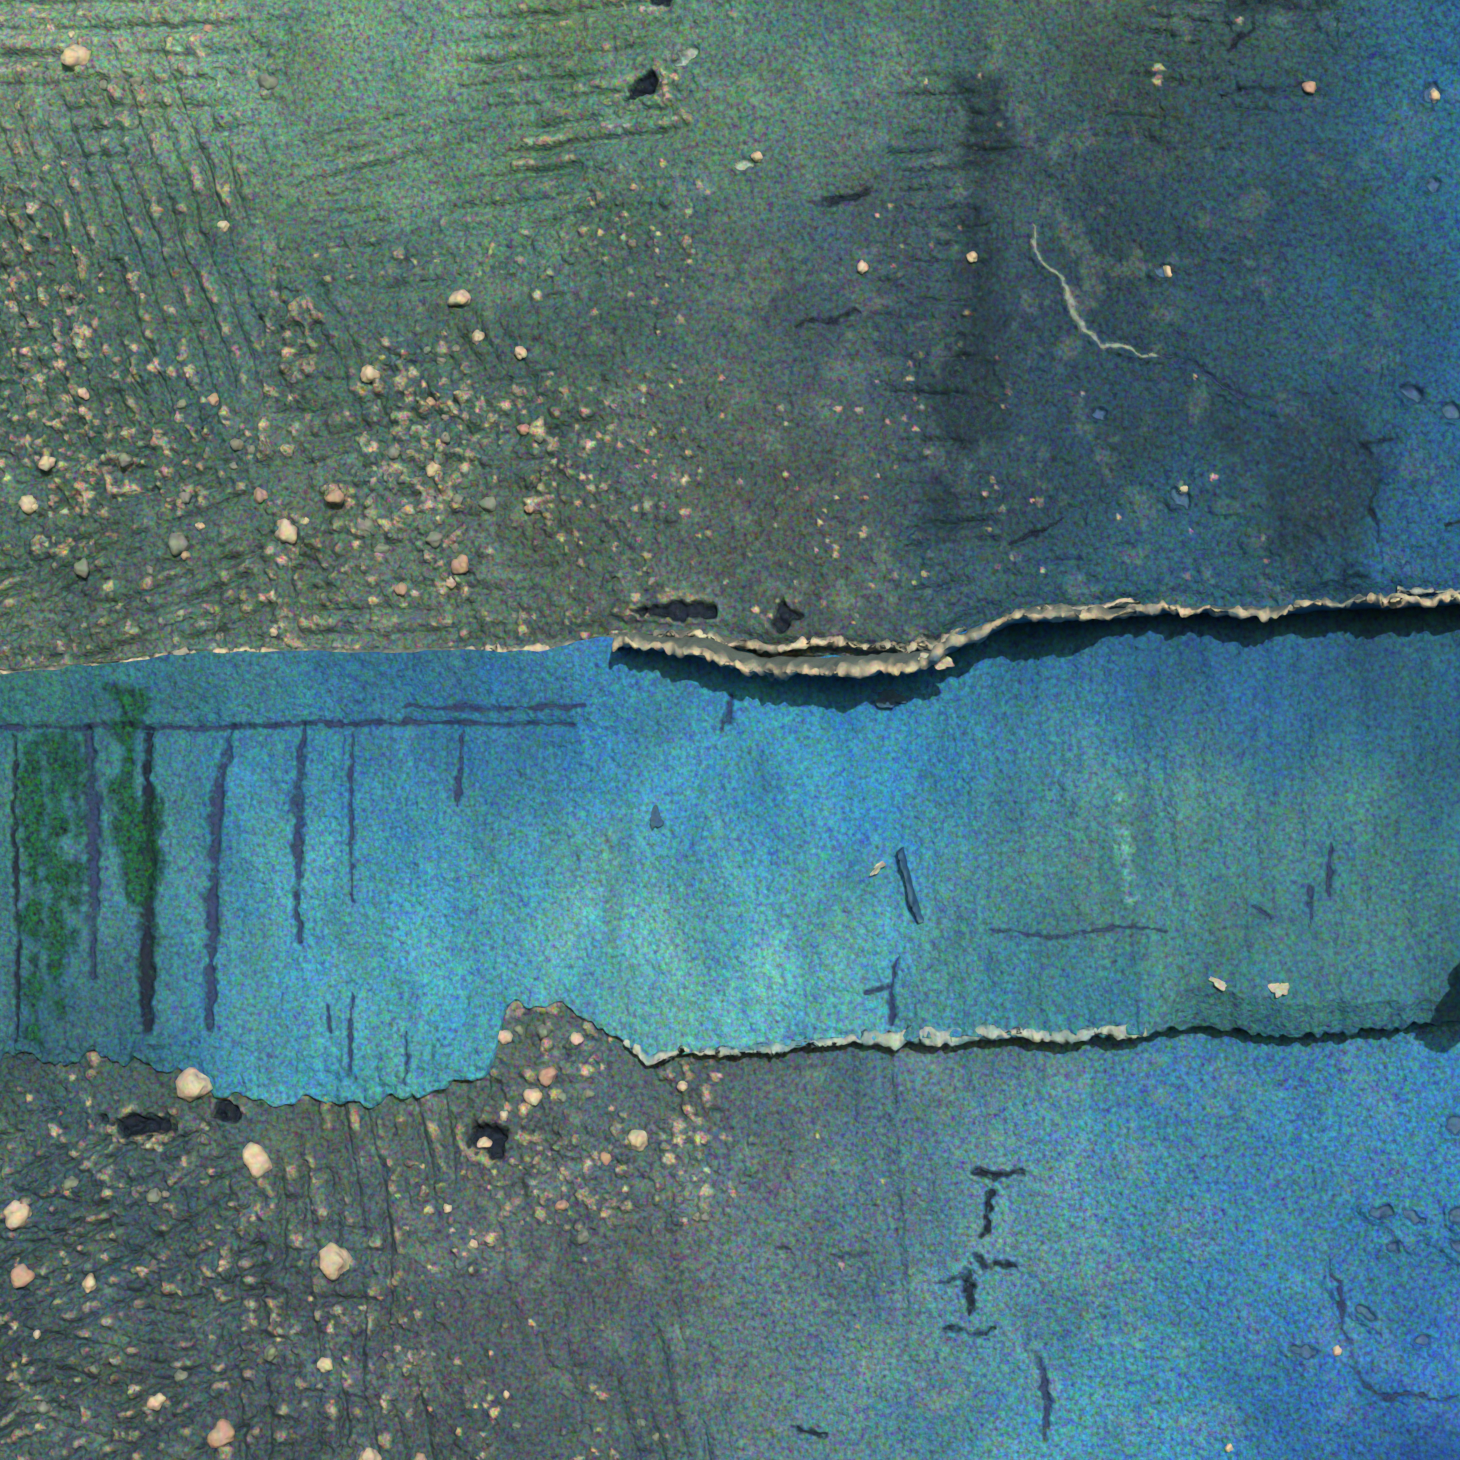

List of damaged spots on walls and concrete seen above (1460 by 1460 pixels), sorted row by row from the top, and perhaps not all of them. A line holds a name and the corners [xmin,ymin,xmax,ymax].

spalling [772,604,802,633]
peeling [917,635,955,670]
peeling [876,689,908,708]
peeling [650,805,664,829]
peeling [870,847,924,923]
peeling [1209,977,1227,991]
peeling [1268,983,1290,998]
spalling [217,1101,241,1122]
crack [939,1168,1025,1335]
crack [1037,1357,1052,1437]